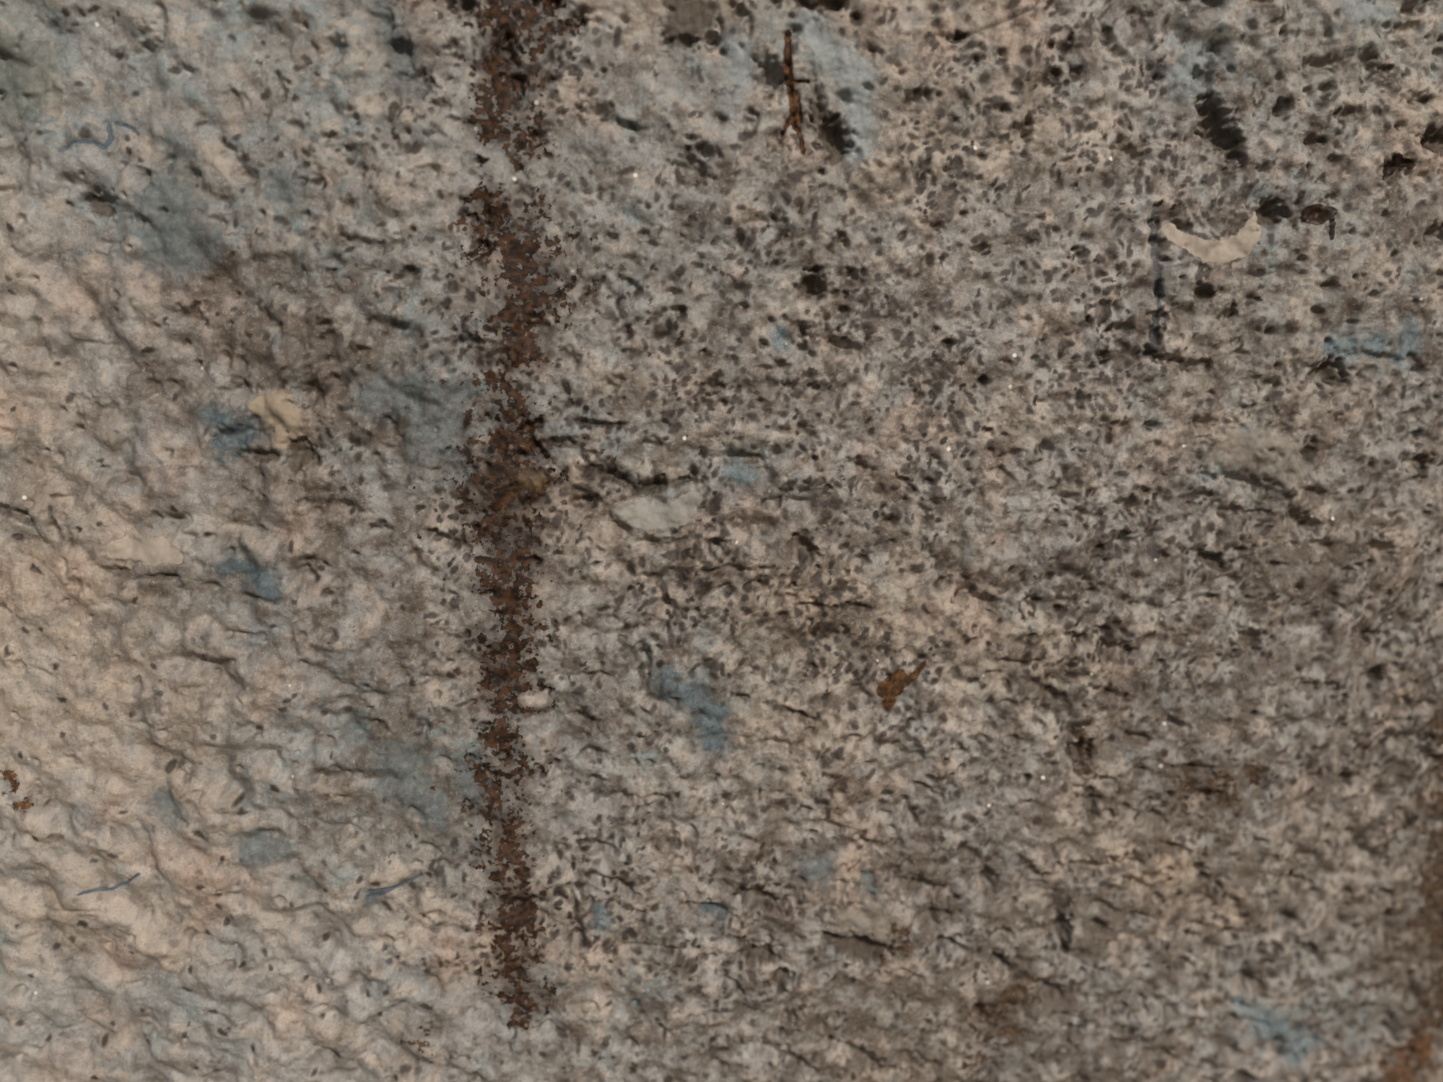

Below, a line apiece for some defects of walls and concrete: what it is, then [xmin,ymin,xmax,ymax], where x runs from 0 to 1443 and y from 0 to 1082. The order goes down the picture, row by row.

rust [430,0,600,1030]